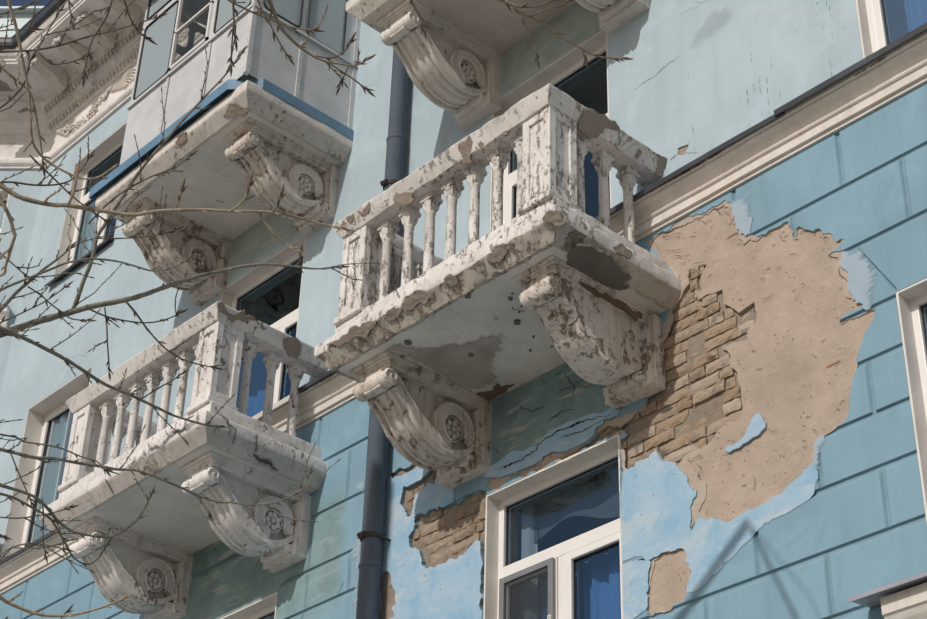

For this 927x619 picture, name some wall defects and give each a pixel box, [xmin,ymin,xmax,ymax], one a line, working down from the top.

spalling [577,108,620,139]
spalling [458,136,484,164]
spalling [346,202,370,223]
spalling [393,192,415,206]
spalling [327,290,436,347]
spalling [283,337,302,357]
crack [495,366,612,471]
flaking render [380,199,875,619]